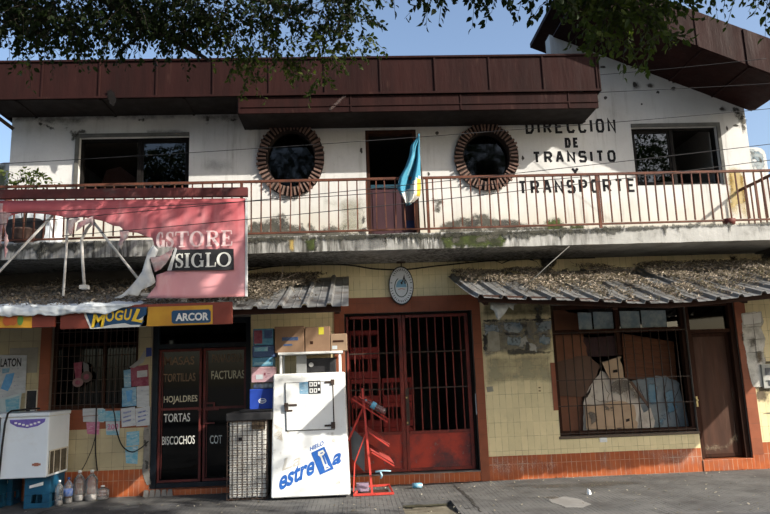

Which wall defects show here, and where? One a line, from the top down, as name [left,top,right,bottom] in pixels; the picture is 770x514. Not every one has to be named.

rust [729,173,745,209]
water stain [248,204,770,251]
peeling [483,318,551,355]
peeling [741,311,766,387]